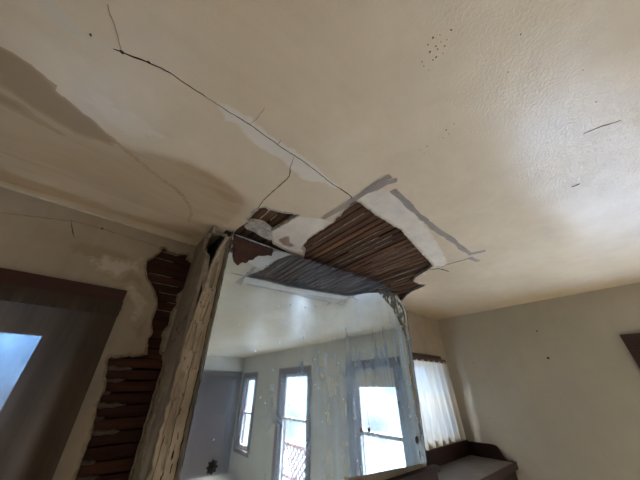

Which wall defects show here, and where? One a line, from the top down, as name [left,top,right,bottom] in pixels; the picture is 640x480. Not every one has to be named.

leakage [0,46,253,240]
crack [108,7,352,208]
spalling [235,206,300,251]
spalling [302,175,486,302]
spalling [71,246,192,480]